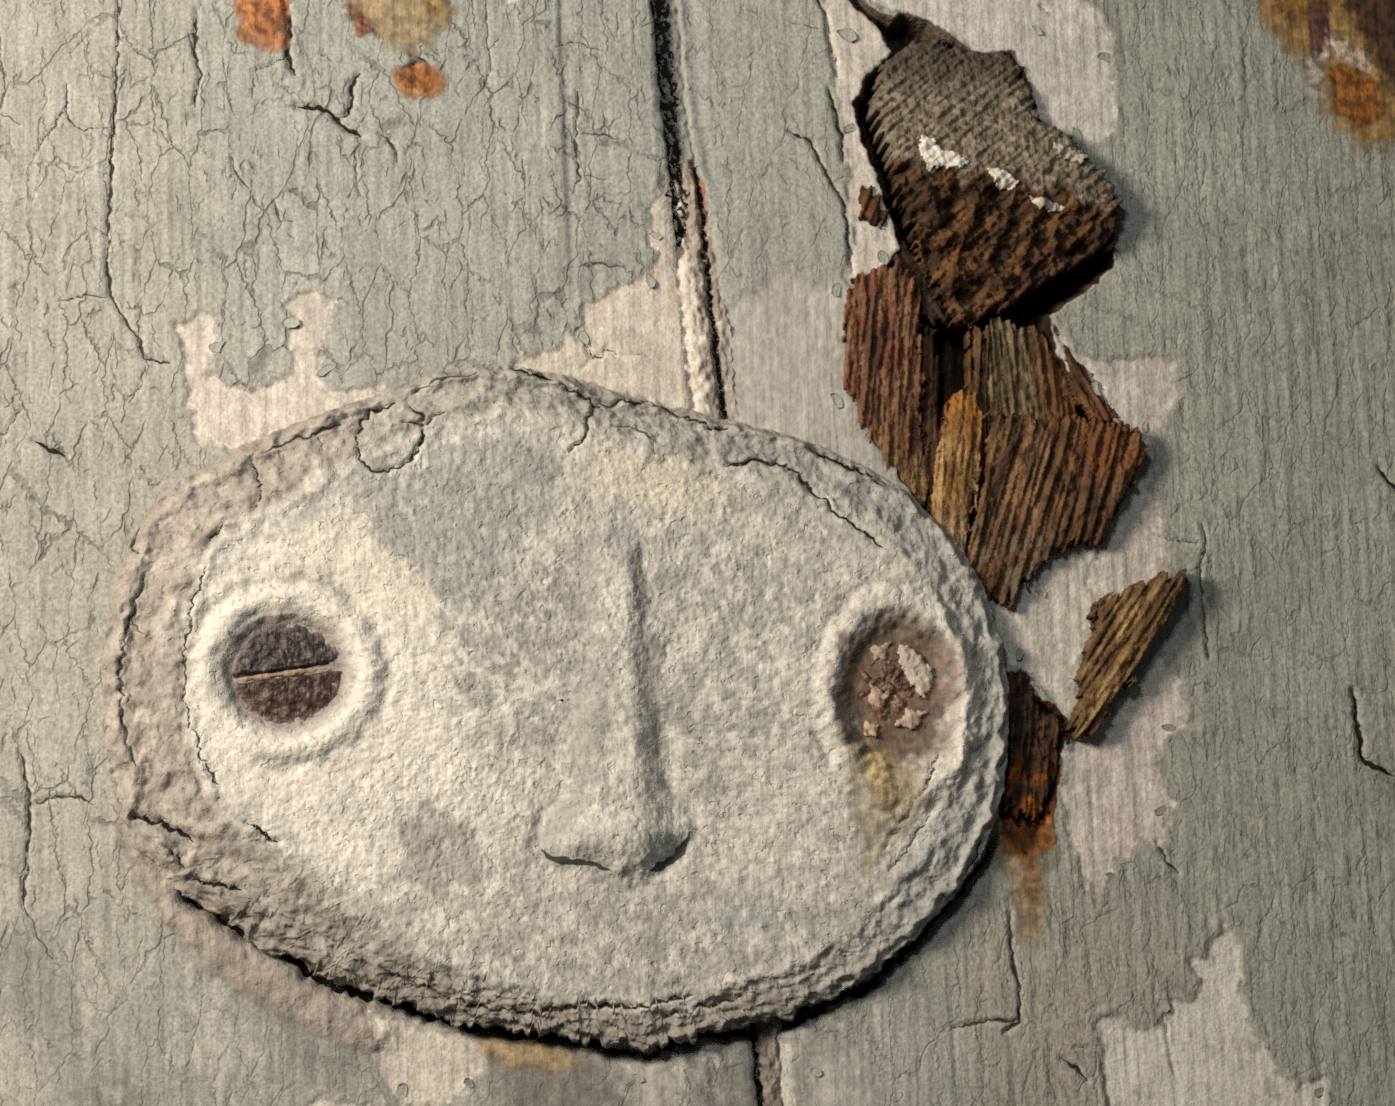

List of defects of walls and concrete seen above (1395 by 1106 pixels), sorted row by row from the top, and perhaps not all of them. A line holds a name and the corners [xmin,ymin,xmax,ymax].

corrosion [234,0,291,52]
corrosion [347,0,451,100]
corrosion [1262,0,1395,144]
crack [0,0,171,402]
peeling [171,288,386,452]
crack [251,372,477,508]
crack [510,0,728,454]
peeling [512,0,1118,503]
peeling [918,234,1191,906]
corrosion [839,616,958,870]
crack [281,842,992,1106]
peeling [1092,916,1327,1106]